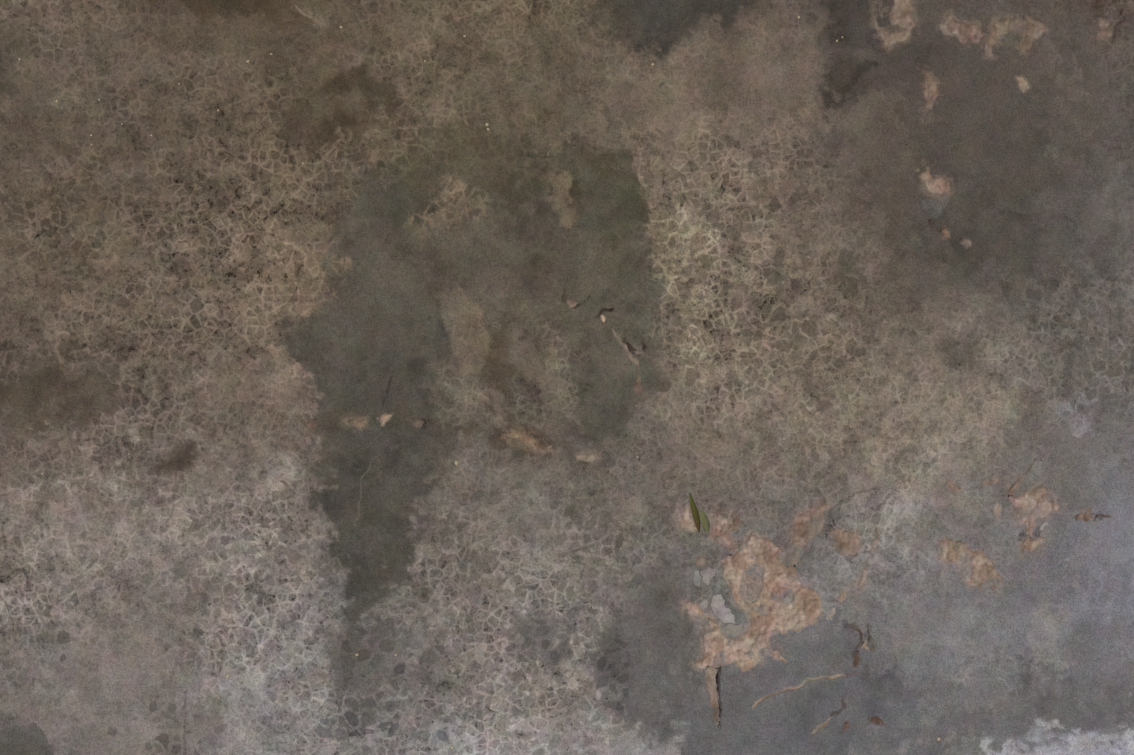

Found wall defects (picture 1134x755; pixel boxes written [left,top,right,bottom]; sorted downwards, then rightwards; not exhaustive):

spalling [914,61,947,120]
spalling [865,0,1054,95]
crack [1089,0,1129,47]
spalling [909,162,956,203]
water stain [503,322,575,419]
spalling [496,420,606,470]
spalling [991,469,1114,565]
spalling [666,491,840,680]